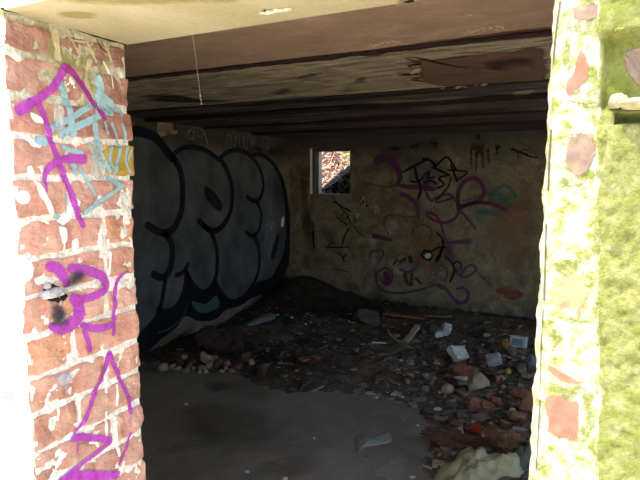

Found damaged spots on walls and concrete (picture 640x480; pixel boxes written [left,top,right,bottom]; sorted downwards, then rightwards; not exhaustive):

spalling [390,48,549,89]